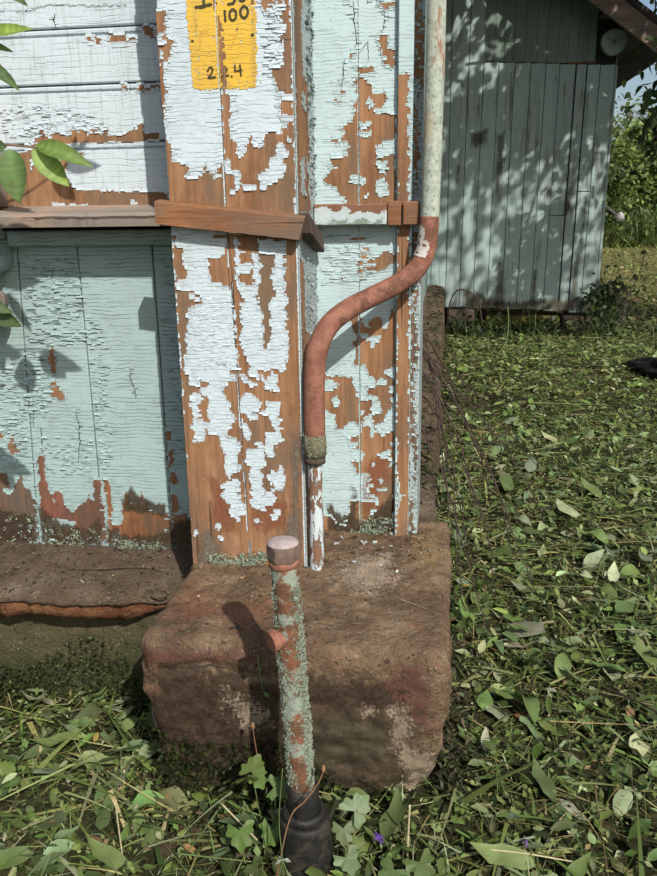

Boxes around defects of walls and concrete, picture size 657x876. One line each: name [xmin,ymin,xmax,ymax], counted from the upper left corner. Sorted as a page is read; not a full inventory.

peeling [0,0,312,215]
peeling [323,0,425,212]
peeling [337,224,419,285]
damp [0,507,220,563]
damp [123,486,166,516]
peeling [0,231,311,567]
peeling [323,279,421,536]
rust [362,457,388,518]